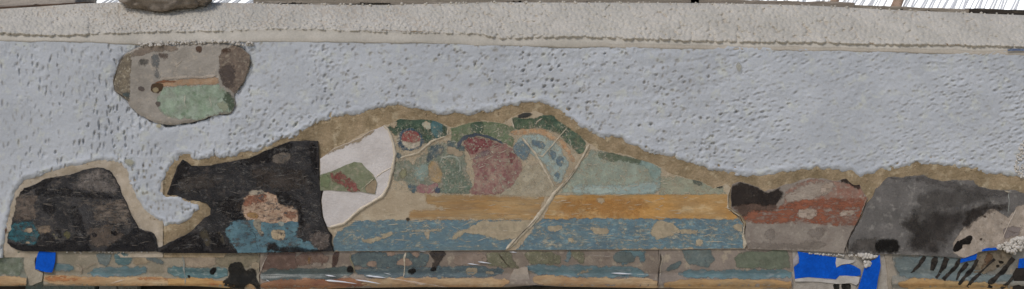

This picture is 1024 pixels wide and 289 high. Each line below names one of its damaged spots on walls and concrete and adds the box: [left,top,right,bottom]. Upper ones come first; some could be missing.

crack [499,128,590,266]